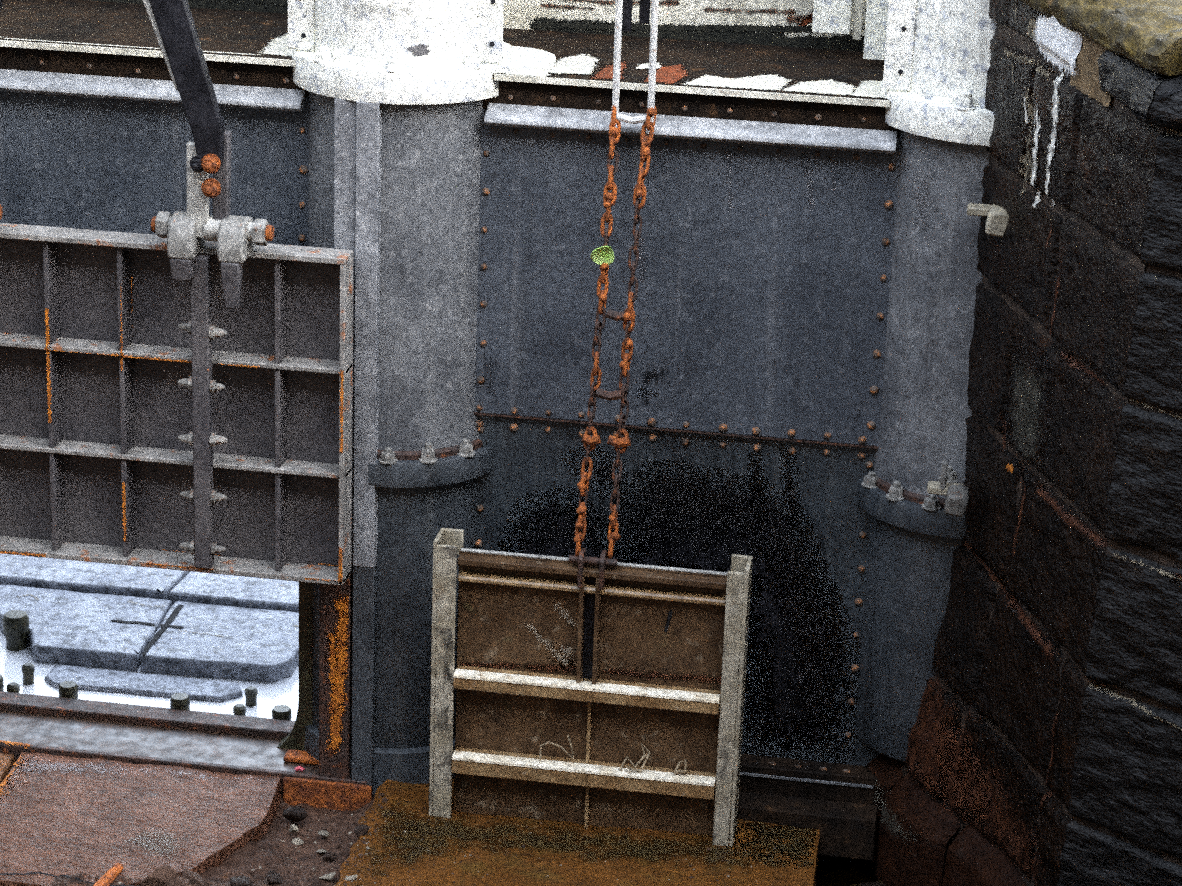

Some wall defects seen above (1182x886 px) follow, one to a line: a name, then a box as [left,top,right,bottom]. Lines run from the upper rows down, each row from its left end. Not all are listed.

leakage [1005,50,1064,207]
corrosion [45,275,192,423]
corrosion [304,548,349,754]
leakage [511,450,855,756]
corrosion [0,740,30,794]